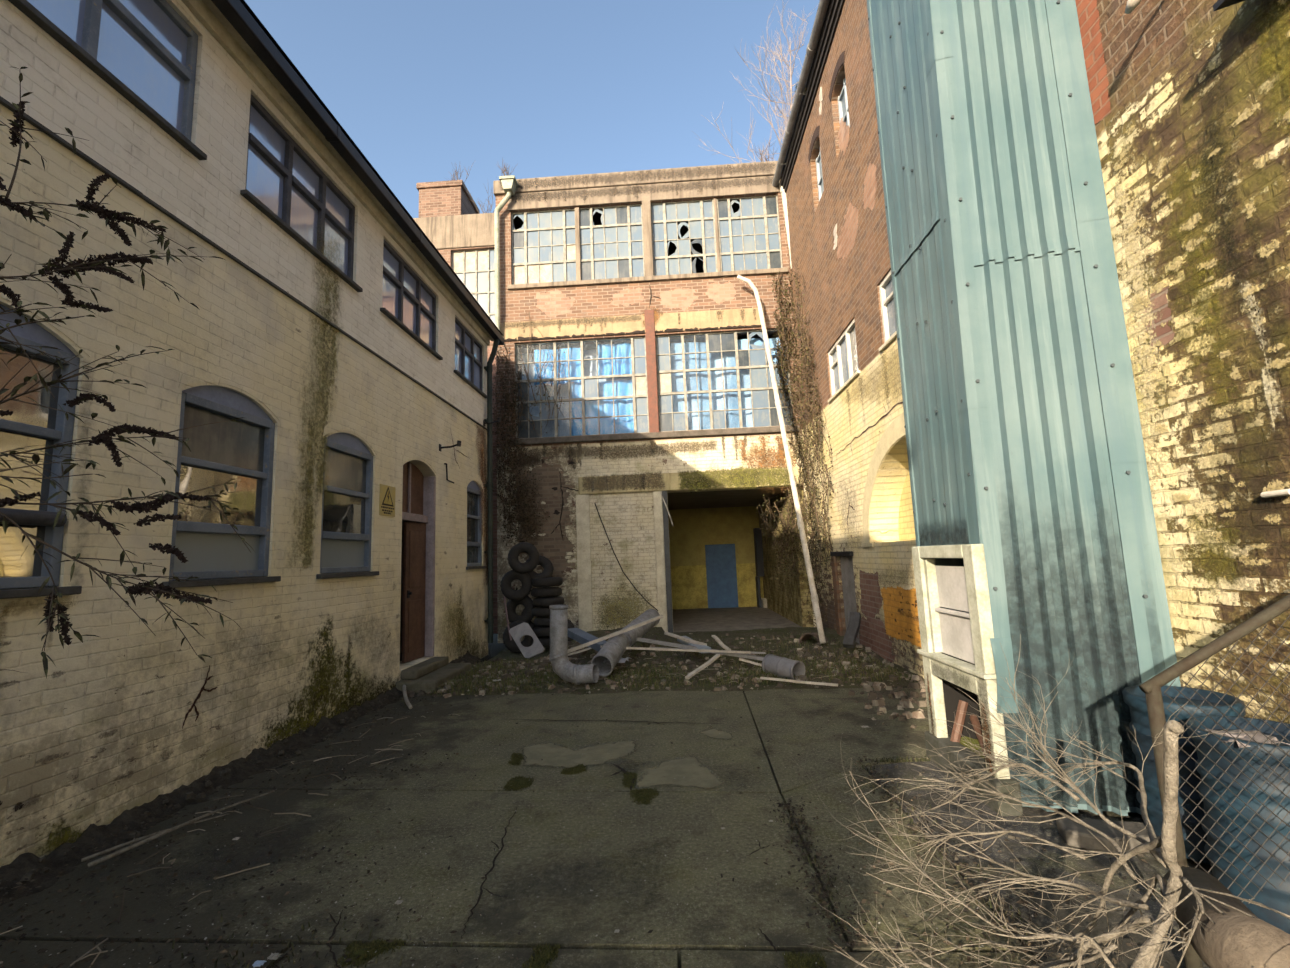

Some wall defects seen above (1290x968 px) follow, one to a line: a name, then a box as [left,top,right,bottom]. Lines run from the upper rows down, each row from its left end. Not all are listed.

peeling [1230,100,1261,128]
peeling [1258,239,1281,258]
peeling [1110,125,1264,499]
leakage [1241,283,1282,427]
peeling [1264,343,1290,369]
leakage [303,282,337,566]
leakage [518,436,747,491]
peeling [1193,442,1246,542]
peeling [1263,479,1290,524]
peeling [1239,543,1271,567]
peeling [859,570,922,649]
crack [461,808,517,938]